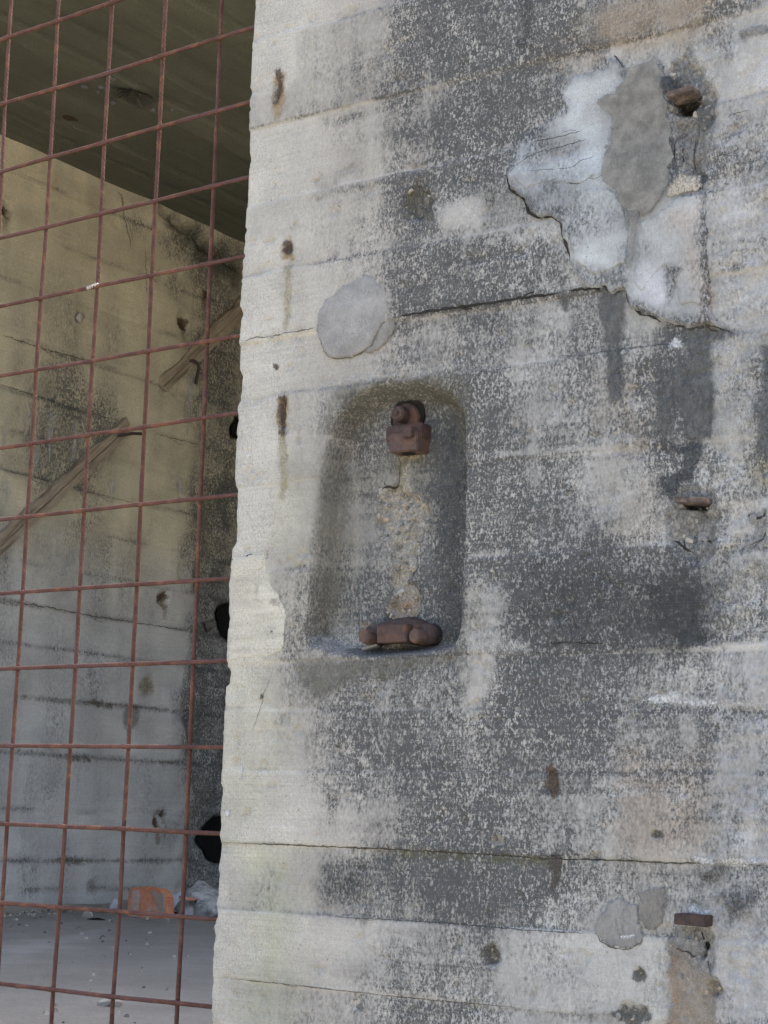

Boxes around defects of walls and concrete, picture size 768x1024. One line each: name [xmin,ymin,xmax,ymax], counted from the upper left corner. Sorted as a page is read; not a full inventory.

corrosion [273,69,284,115]
peeling [507,47,724,329]
water stain [597,58,700,268]
water stain [557,291,570,311]
crack [397,286,731,363]
corrosion [276,395,287,490]
spalling [375,487,430,619]
crack [242,843,768,866]
spalling [667,926,722,1024]